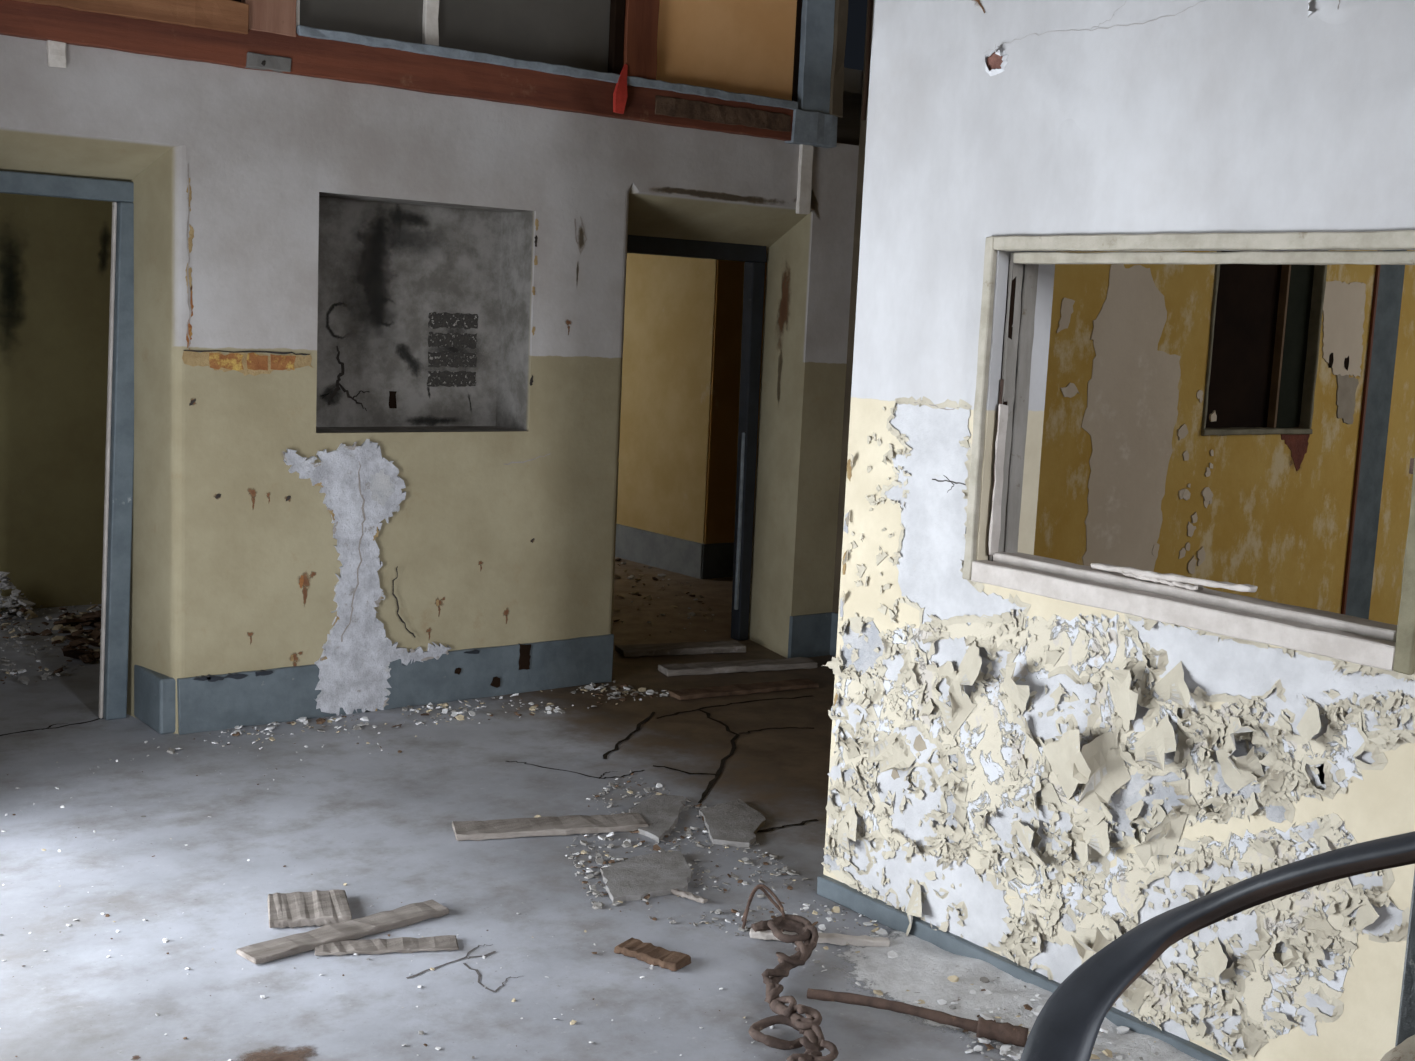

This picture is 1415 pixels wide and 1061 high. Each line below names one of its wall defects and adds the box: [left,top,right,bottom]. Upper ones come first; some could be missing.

spalling [985,44,1008,76]
leakage [0,240,21,337]
spalling [182,165,313,376]
flaking render [1061,264,1217,574]
rust [299,572,316,605]
crack [506,696,814,803]
crack [757,819,818,832]
peeling [1112,868,1410,1061]